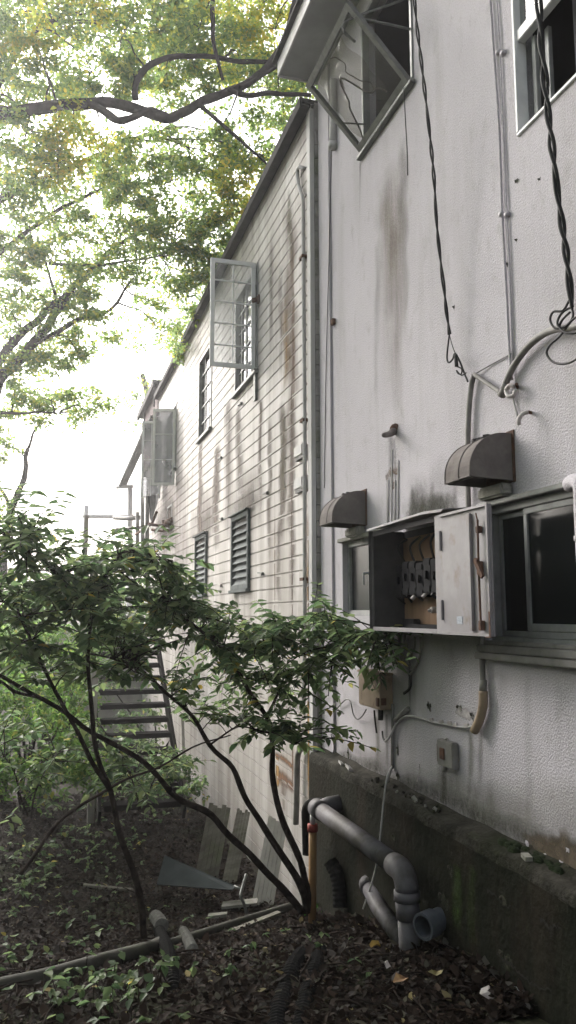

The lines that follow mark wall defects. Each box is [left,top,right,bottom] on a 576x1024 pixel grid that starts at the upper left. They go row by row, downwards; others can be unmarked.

corrosion [274,222,295,592]
leakage [198,408,241,536]
leakage [267,413,287,530]